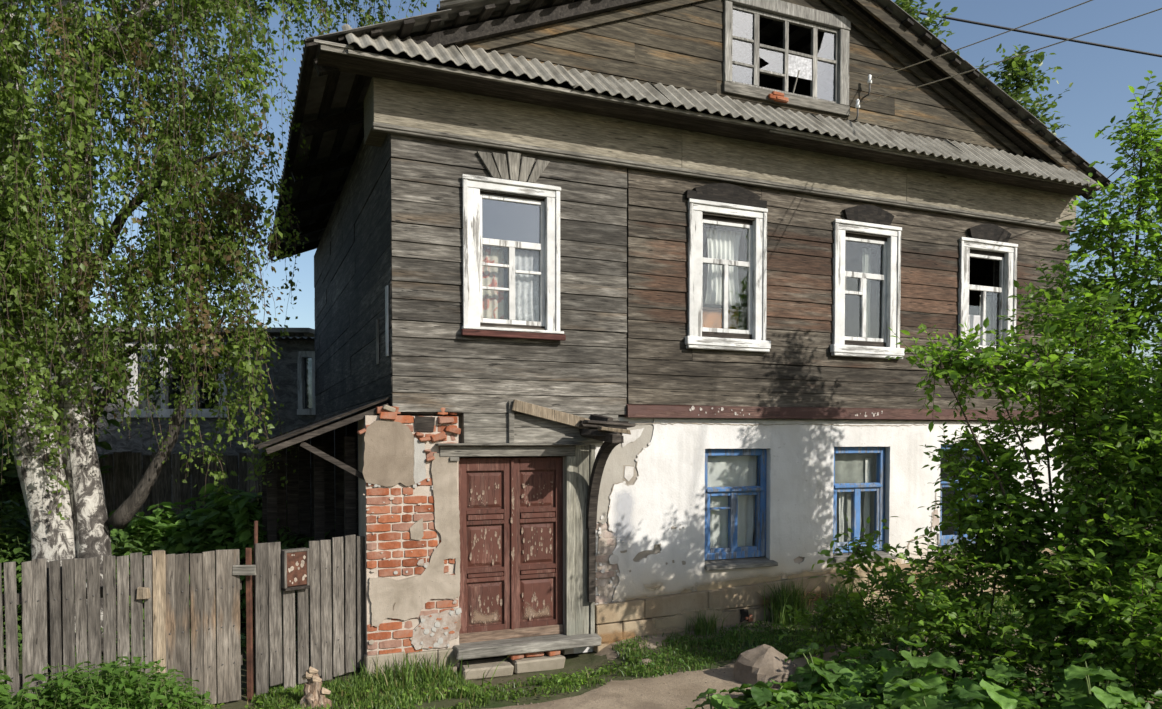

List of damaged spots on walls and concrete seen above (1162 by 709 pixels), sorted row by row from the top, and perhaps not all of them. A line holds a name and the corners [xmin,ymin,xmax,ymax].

spalling [357,405,461,462]
peeling [363,478,455,577]
peeling [469,478,553,566]
flaking render [595,422,686,604]
peeling [367,594,502,656]
peeling [522,592,552,620]